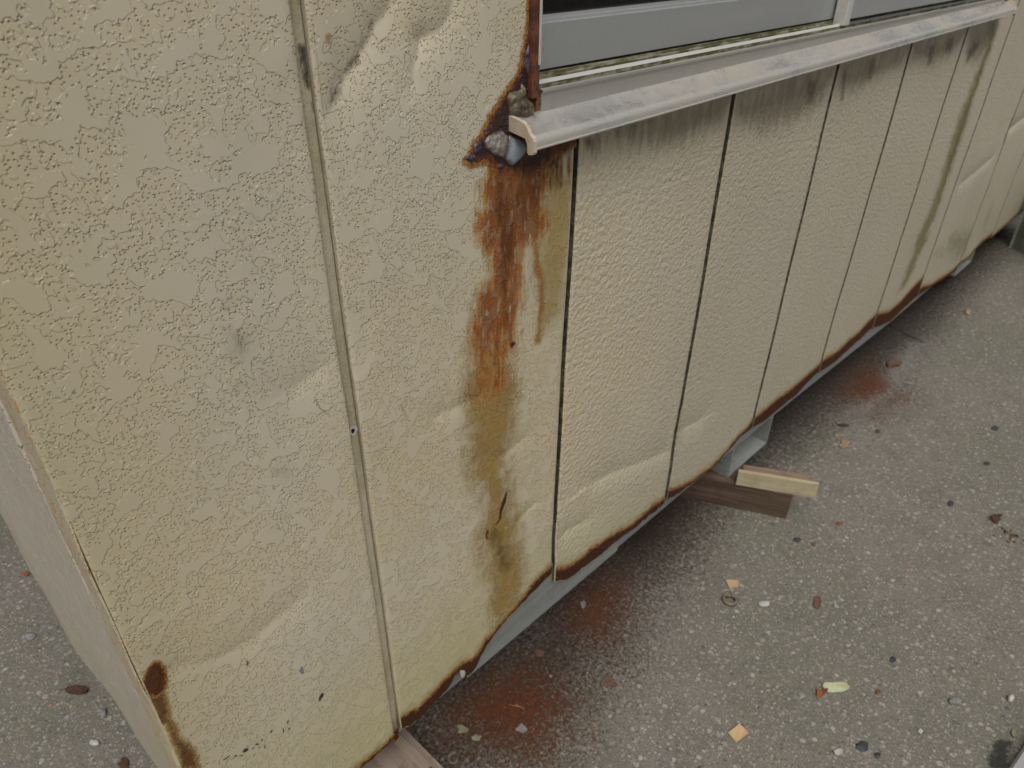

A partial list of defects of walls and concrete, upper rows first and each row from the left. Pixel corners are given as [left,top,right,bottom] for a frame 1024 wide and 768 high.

corrosion [142,660,201,768]
corrosion [355,0,1024,768]